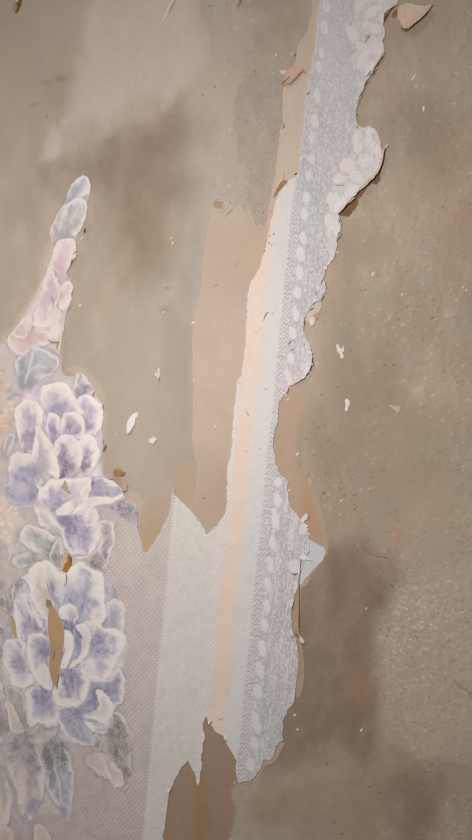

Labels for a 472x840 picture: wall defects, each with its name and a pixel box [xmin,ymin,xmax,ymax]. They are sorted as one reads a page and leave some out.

peeling [109,468,128,492]
leakage [29,0,230,553]
peeling [126,412,138,435]
leakage [257,519,463,840]